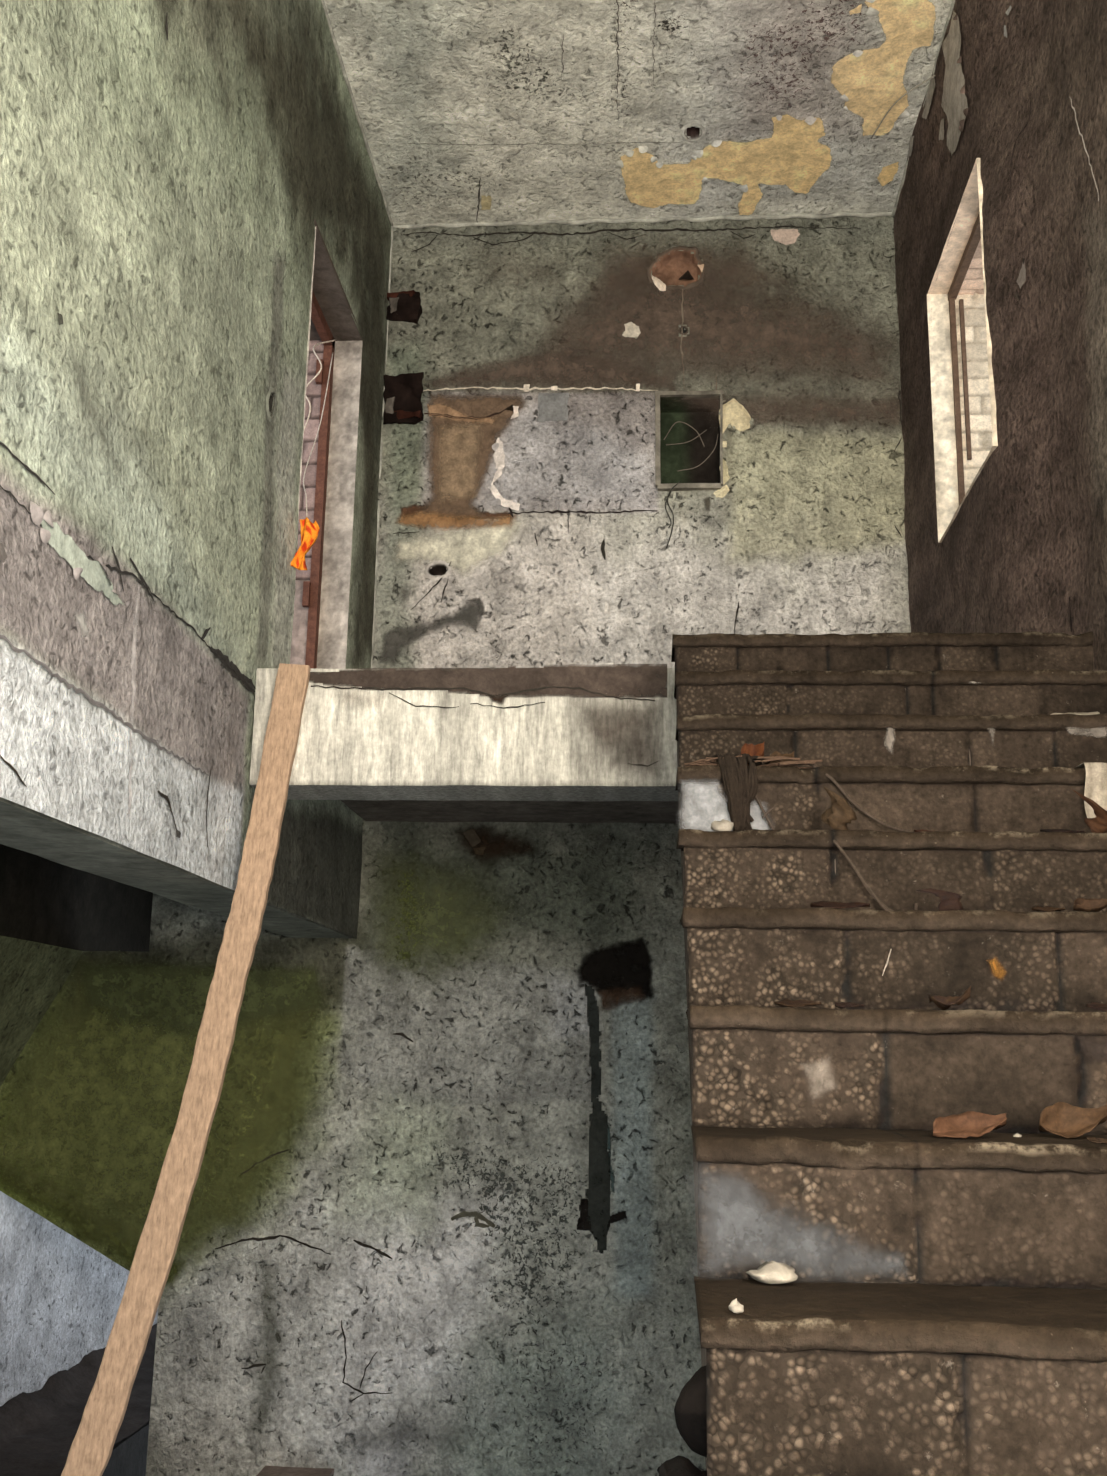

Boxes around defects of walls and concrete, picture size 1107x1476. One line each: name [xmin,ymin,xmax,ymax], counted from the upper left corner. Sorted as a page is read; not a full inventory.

peeling [825,0,969,156]
peeling [615,114,832,215]
peeling [876,136,914,186]
crack [0,442,55,514]
crack [87,546,256,694]